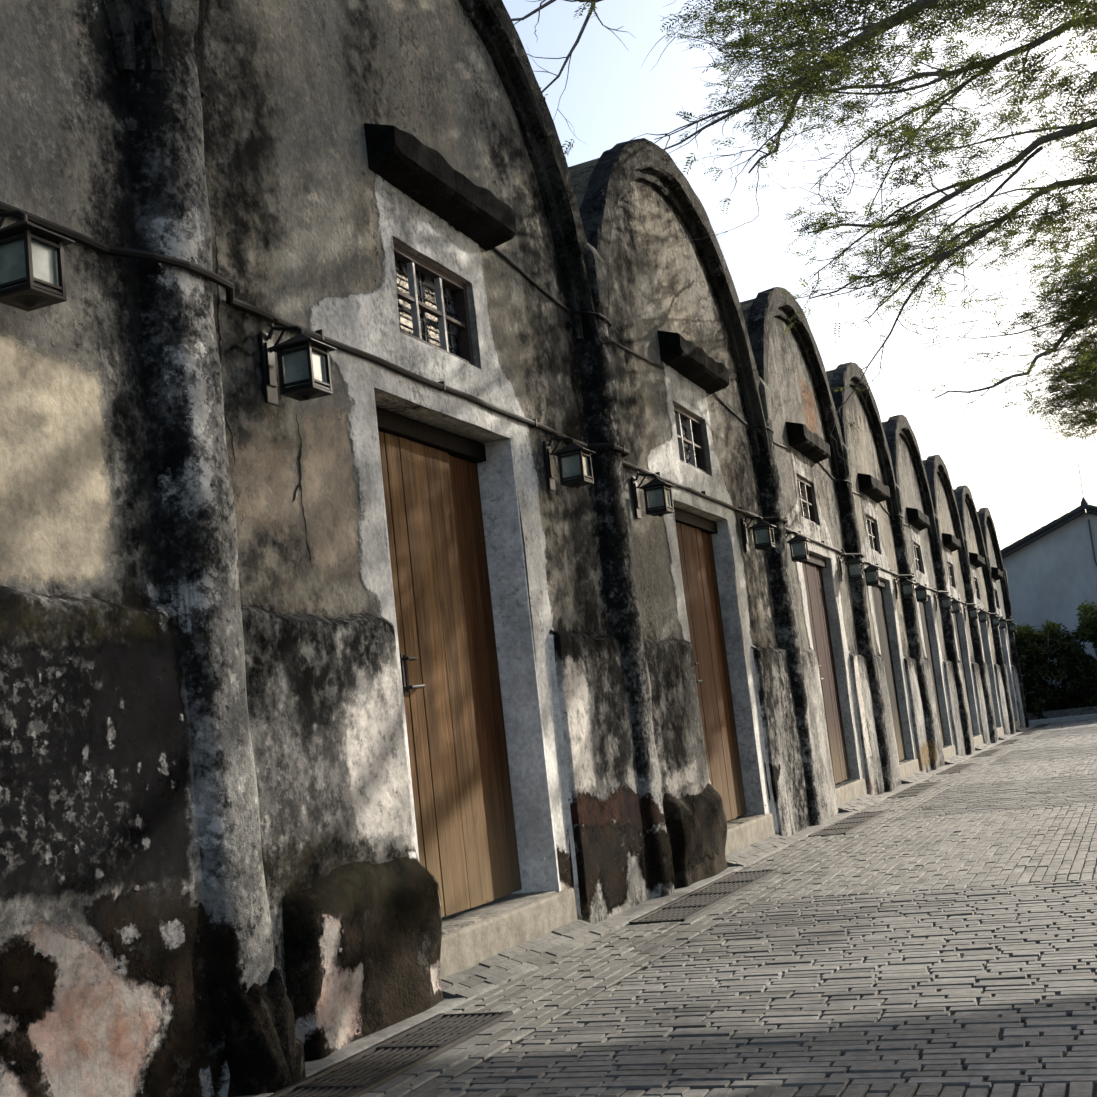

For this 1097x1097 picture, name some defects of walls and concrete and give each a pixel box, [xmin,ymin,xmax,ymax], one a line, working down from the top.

water stain [204,0,277,271]
water stain [100,24,199,604]
crack [292,414,311,563]
water stain [492,123,690,819]
water stain [713,291,814,829]
water stain [247,609,396,838]
spalling [0,868,248,1097]